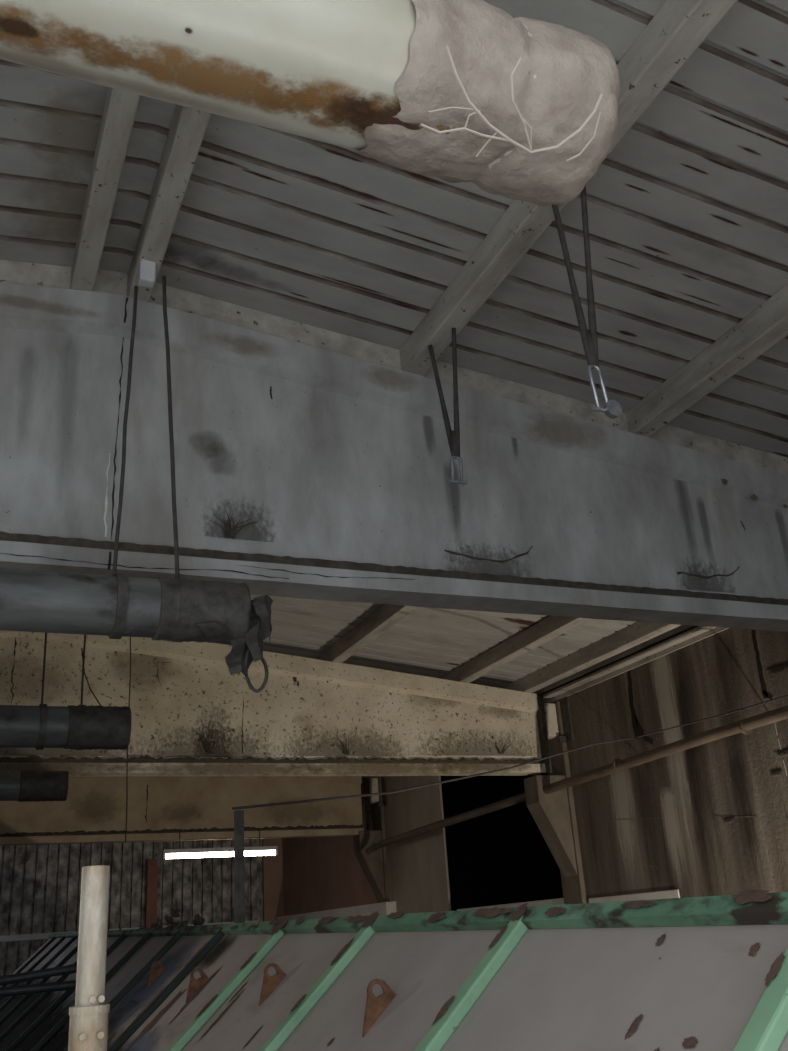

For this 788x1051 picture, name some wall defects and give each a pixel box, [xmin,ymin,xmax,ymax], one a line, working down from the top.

rust [0,8,422,133]
rust [473,903,528,950]
rust [620,900,657,908]